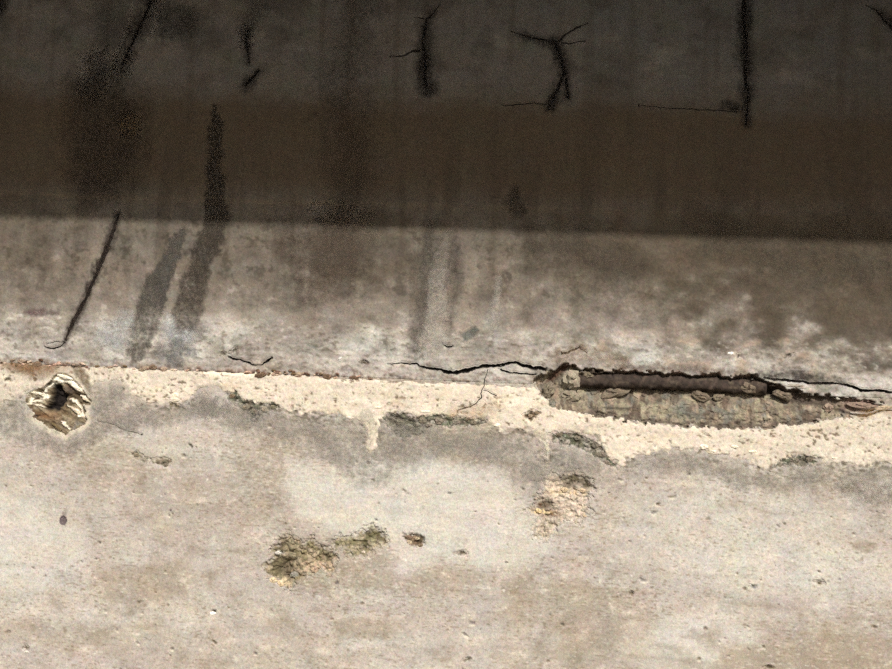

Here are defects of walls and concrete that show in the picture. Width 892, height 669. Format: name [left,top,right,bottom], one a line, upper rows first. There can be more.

crack [391,4,440,95]
crack [502,23,588,110]
crack [639,0,753,126]
water stain [97,105,228,363]
crack [44,213,120,351]
peeling [0,359,892,471]
crack [388,343,545,412]
crack [562,346,587,355]
crack [765,370,892,419]
spalling [261,522,390,593]
spalling [401,532,426,548]
spalling [523,465,597,544]